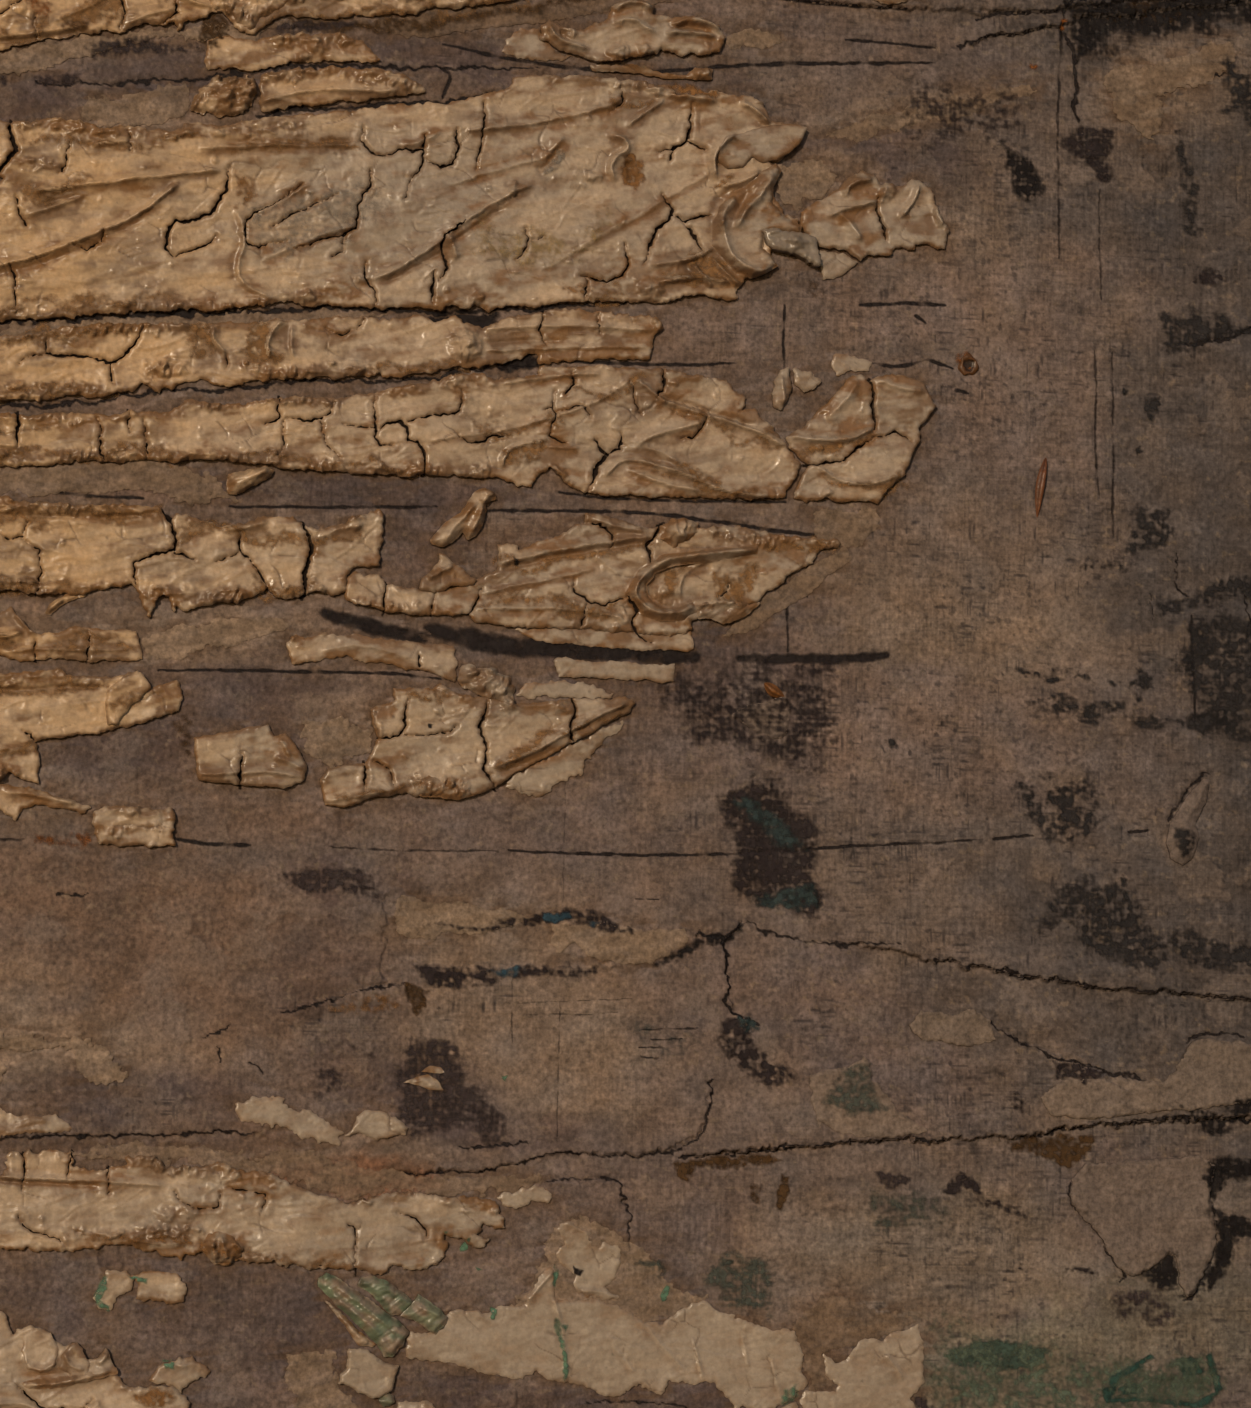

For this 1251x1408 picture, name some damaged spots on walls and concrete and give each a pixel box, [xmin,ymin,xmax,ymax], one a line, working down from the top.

crack [956,0,1176,122]
peeling [0,0,950,504]
peeling [0,495,841,848]
damp [1017,576,1251,741]
damp [720,779,823,917]
crack [696,921,901,1026]
crack [933,958,1251,1043]
damp [1043,868,1251,970]
peeling [0,1108,552,1310]
crack [404,1079,946,1236]
peeling [0,1311,211,1408]
peeling [337,1221,925,1408]